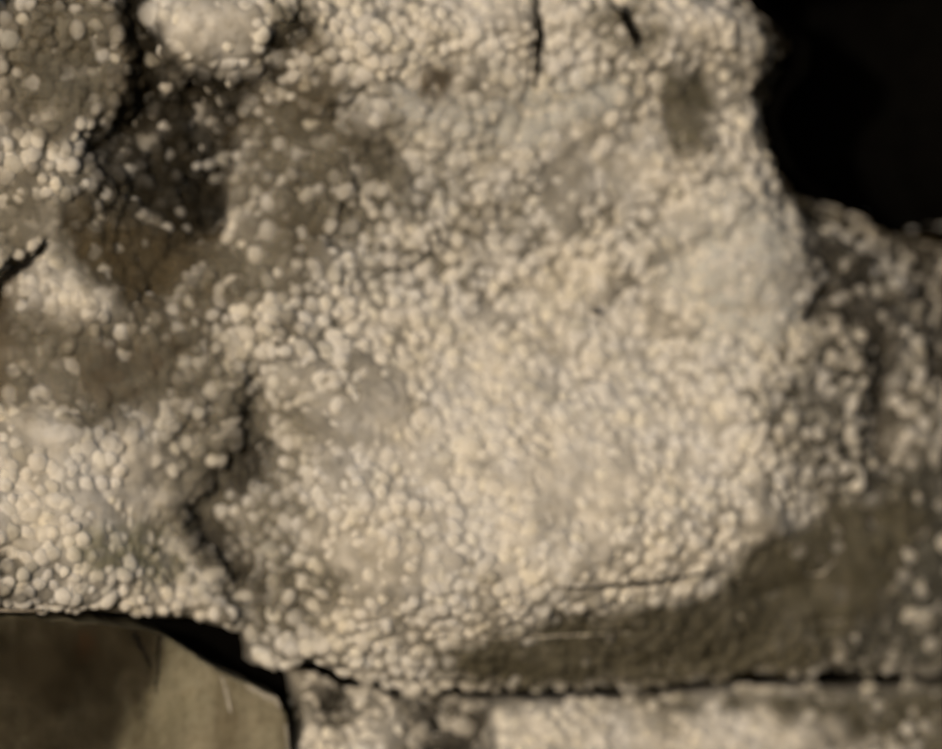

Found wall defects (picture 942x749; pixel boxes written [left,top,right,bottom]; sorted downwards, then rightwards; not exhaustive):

water stain [0,0,407,623]
spalling [610,3,641,50]